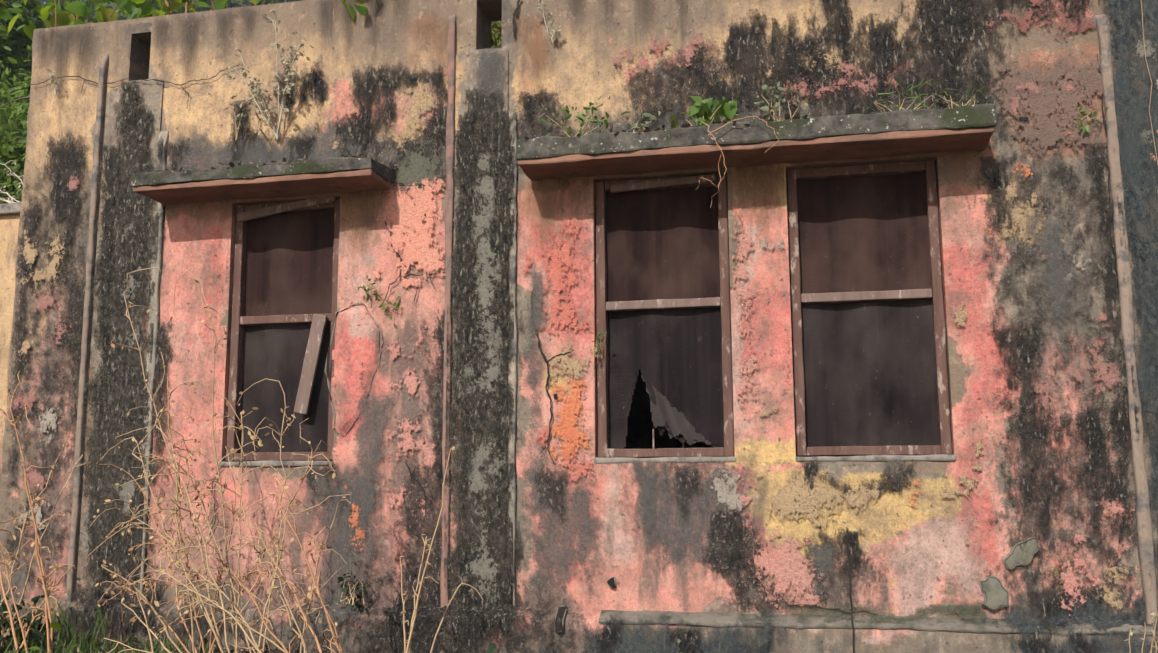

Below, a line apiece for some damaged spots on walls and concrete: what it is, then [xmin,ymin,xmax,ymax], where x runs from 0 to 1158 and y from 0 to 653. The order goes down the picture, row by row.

crack [31,64,240,108]
water stain [2,55,452,648]
crack [531,290,574,464]
water stain [305,0,1158,653]
peeling [708,460,889,615]